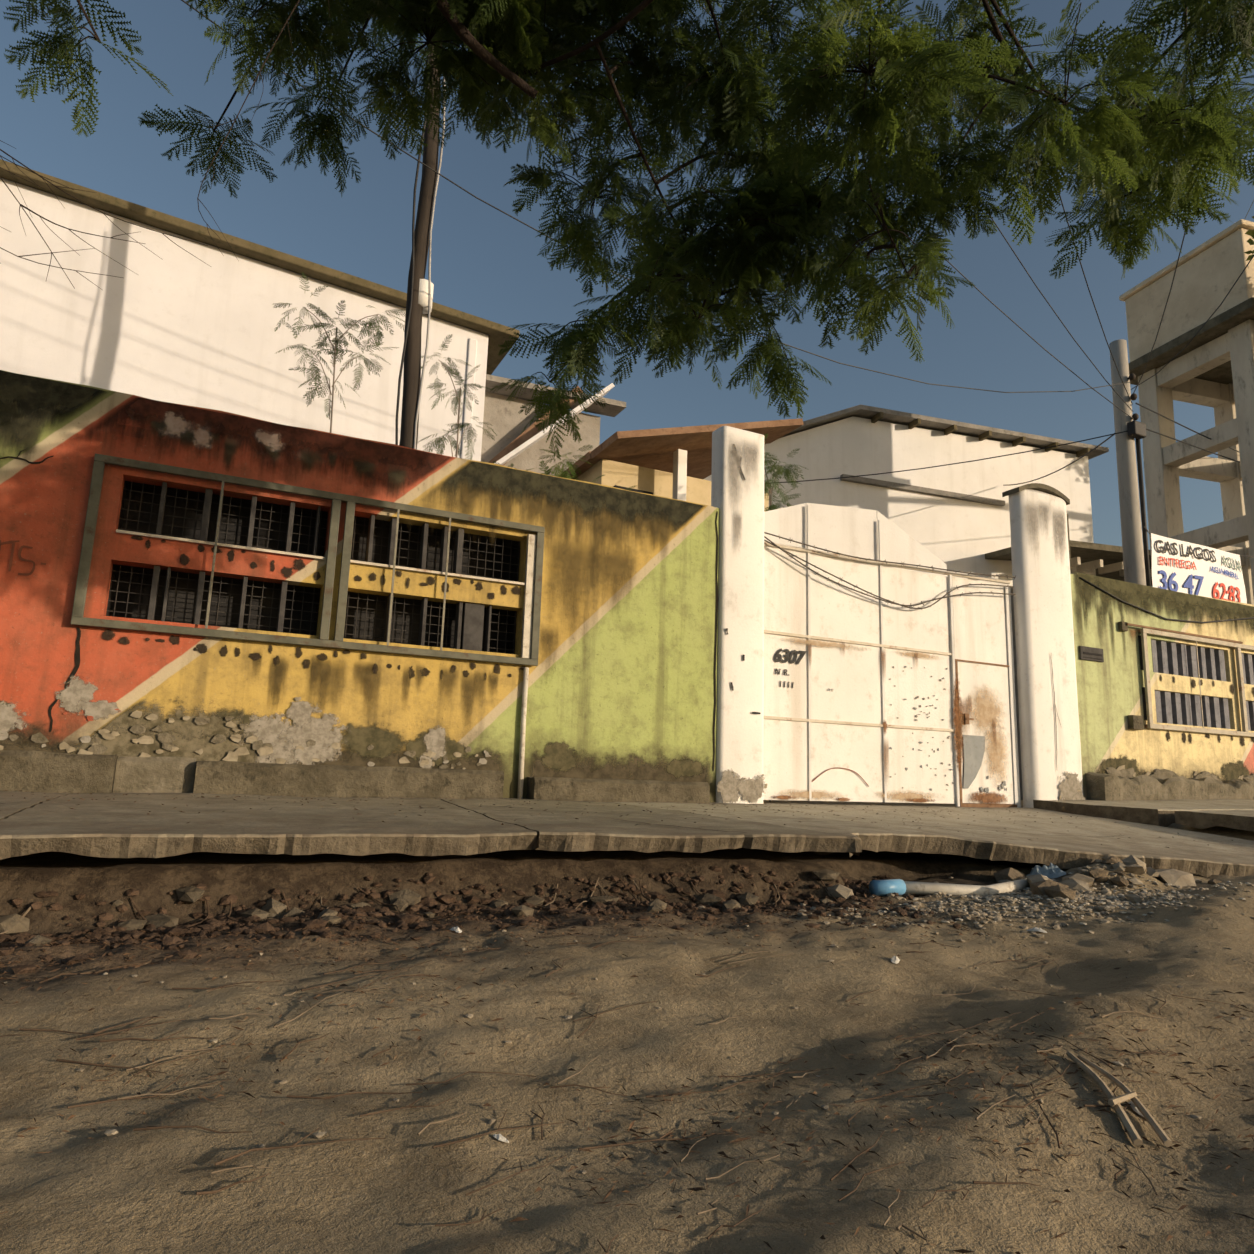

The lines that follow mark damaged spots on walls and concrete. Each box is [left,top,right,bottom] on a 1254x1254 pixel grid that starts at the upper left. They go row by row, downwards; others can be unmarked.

damp [0,371,105,455]
damp [102,629,130,645]
damp [145,635,180,645]
damp [1076,572,1254,647]
crack [48,627,81,732]
damp [193,643,525,713]
spalling [0,675,348,765]
damp [217,708,258,739]
damp [266,723,503,771]
rust [953,680,1006,777]
rust [971,792,1007,805]